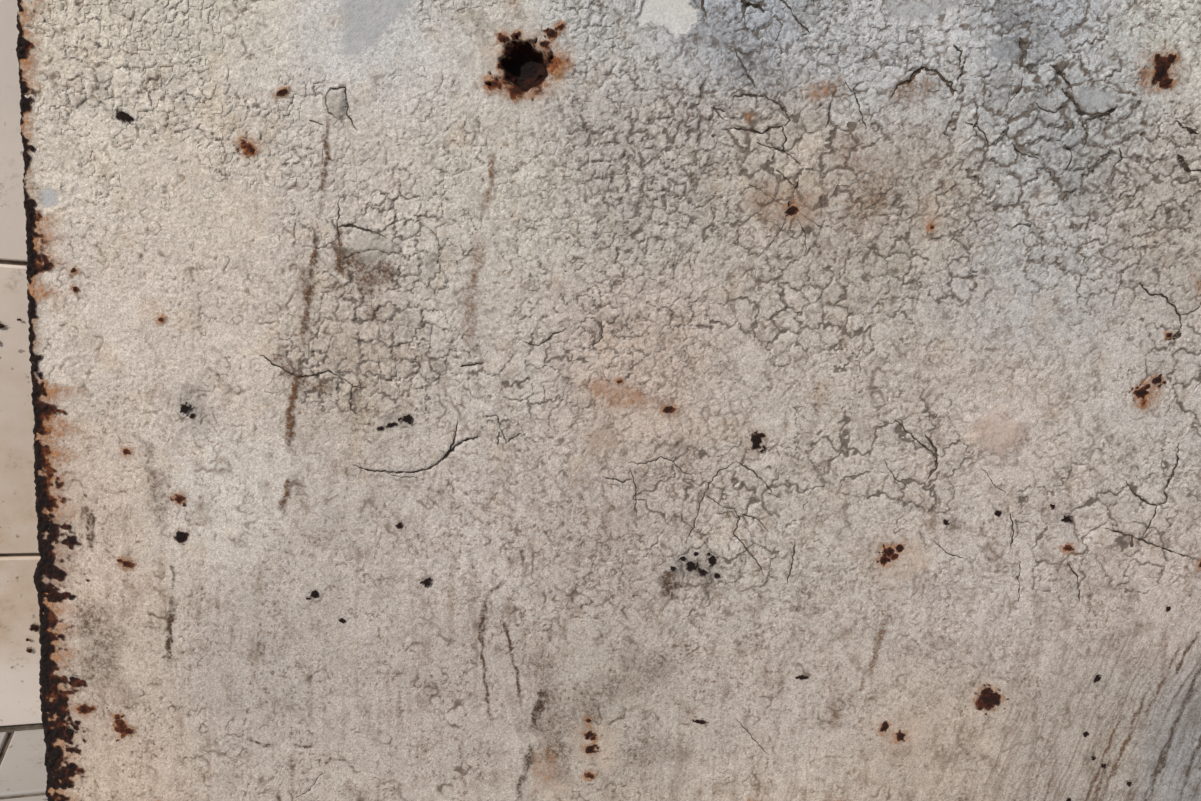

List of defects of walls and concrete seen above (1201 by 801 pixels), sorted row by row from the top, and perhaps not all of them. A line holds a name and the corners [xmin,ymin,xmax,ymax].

corrosion [484,24,567,101]
crack [711,0,822,252]
crack [890,44,963,98]
crack [965,37,1118,170]
corrosion [1142,53,1179,92]
peeling [478,0,1201,425]
corrosion [16,0,95,801]
corrosion [1129,374,1167,409]
crack [355,415,521,478]
crack [603,456,795,583]
corrosion [876,543,926,573]
corrosion [974,684,1009,715]